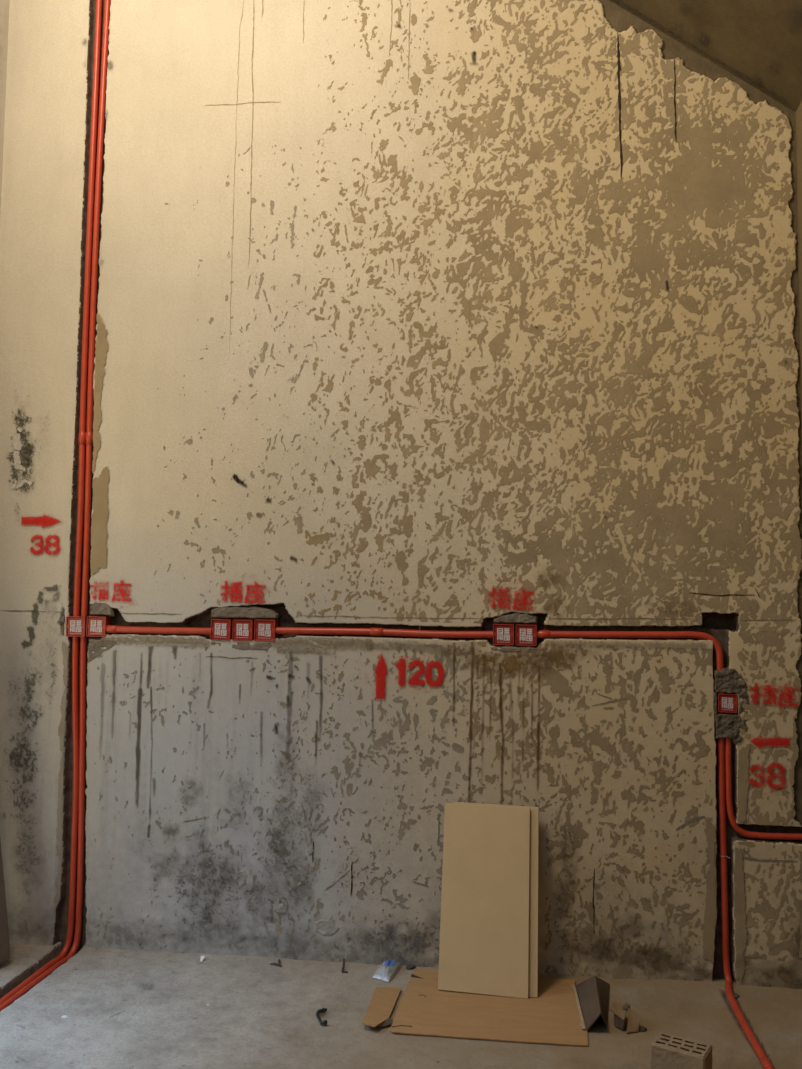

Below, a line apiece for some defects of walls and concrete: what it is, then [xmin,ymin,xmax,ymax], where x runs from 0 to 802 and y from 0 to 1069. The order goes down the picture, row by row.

crack [616,33,624,177]
crack [671,59,679,140]
leakage [7,410,35,491]
peeling [90,314,109,575]
peeling [184,0,802,827]
leakage [4,674,42,809]
leakage [136,646,152,803]